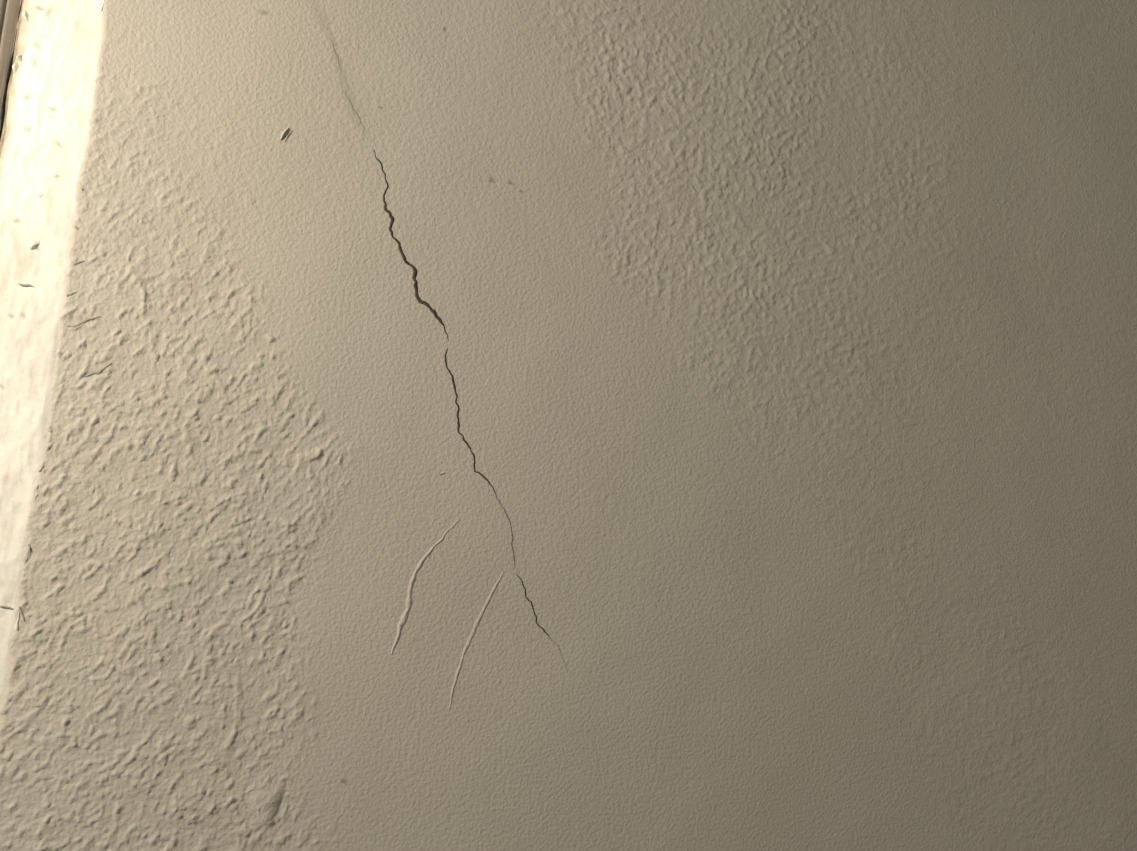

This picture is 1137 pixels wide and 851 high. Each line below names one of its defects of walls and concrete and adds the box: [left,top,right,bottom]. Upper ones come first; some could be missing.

crack [345,93,568,672]